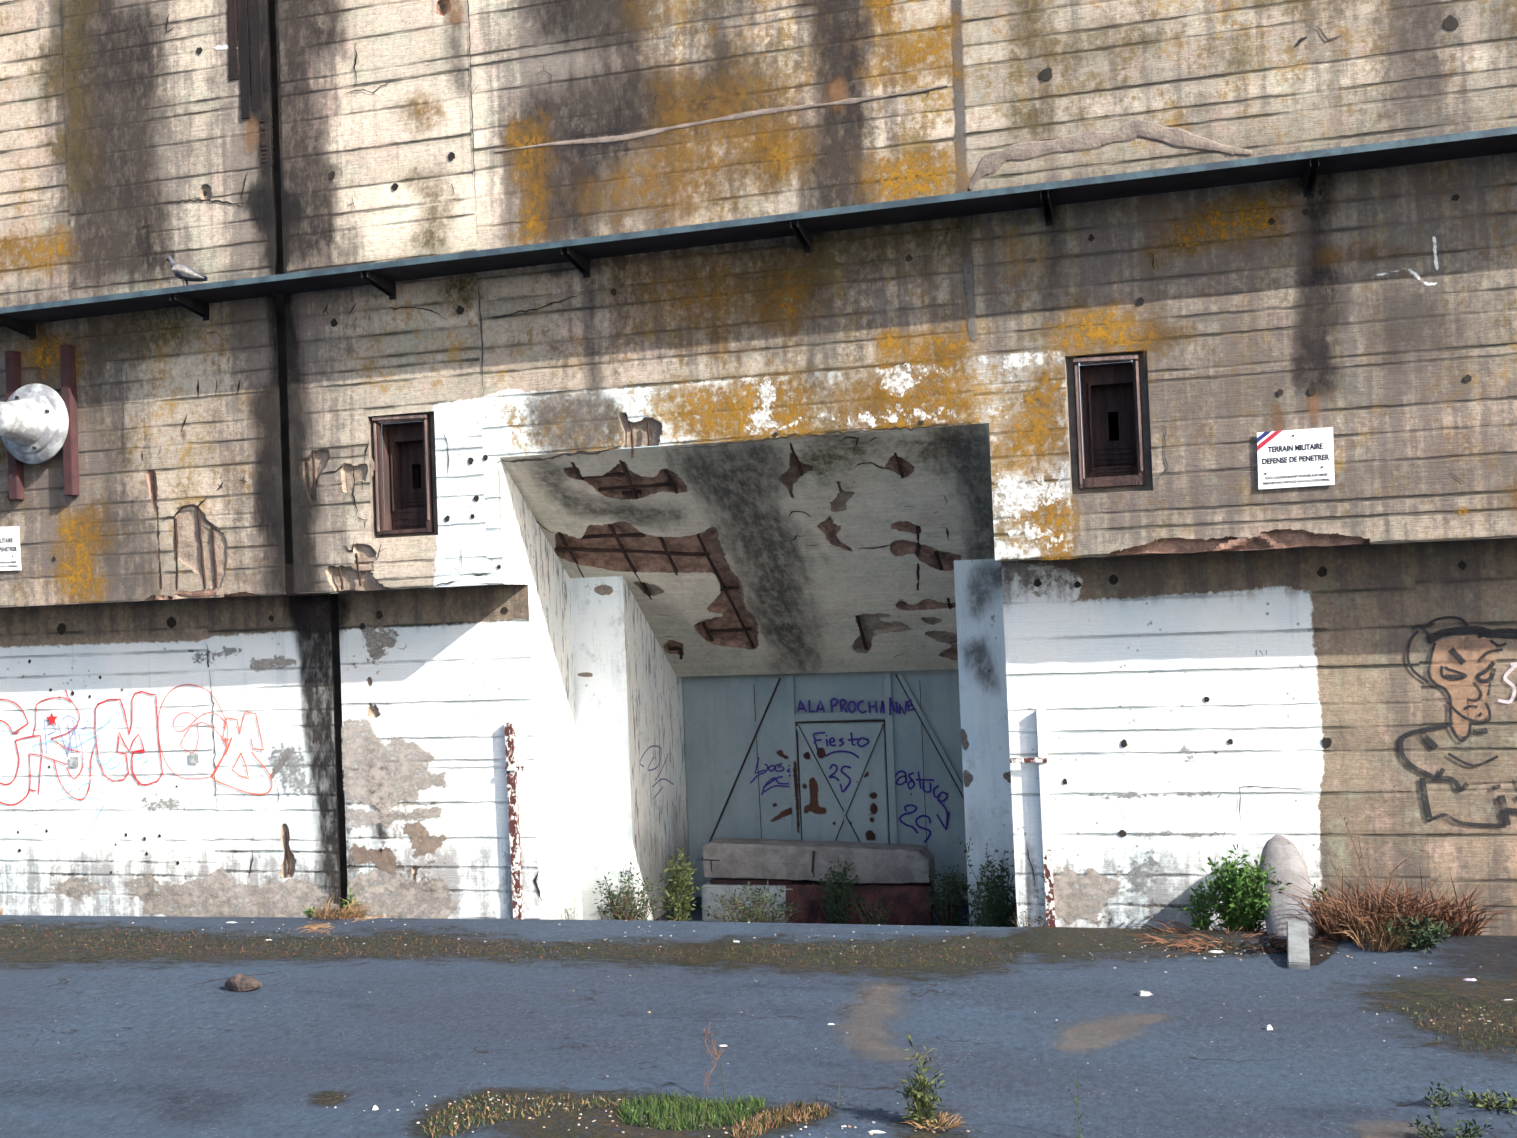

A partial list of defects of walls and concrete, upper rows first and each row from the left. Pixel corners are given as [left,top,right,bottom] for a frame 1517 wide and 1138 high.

water stain [65,0,169,285]
water stain [507,0,747,238]
water stain [808,0,869,209]
water stain [1294,174,1342,392]
spalling [144,470,258,601]
water stain [254,294,349,917]
spalling [302,448,375,502]
spalling [326,543,390,592]
spalling [554,521,759,650]
spalling [852,521,962,660]
spalling [1106,528,1374,556]
peeling [125,625,458,919]